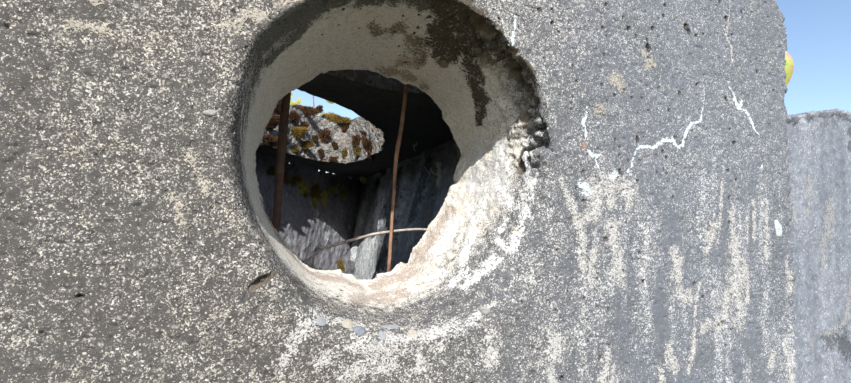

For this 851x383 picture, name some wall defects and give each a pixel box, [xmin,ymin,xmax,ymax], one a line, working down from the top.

damp [367,19,430,63]
crack [581,106,602,173]
crack [627,86,705,173]
crack [729,87,759,134]
damp [556,169,643,290]
damp [655,178,769,383]
damp [545,328,569,383]
damp [596,345,617,383]
damp [767,341,796,383]